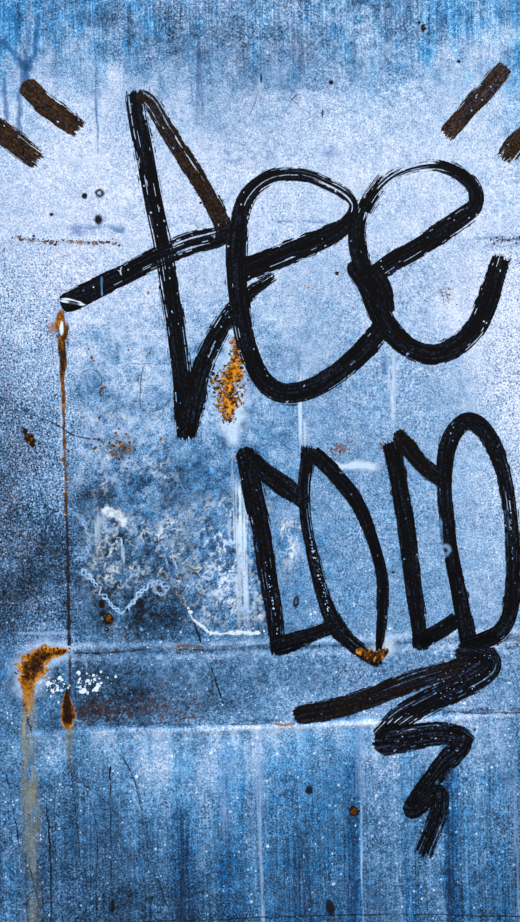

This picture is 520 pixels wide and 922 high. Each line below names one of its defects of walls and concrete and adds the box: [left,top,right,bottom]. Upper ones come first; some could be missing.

water stain [55,506,182,614]
rust [13,310,253,743]
water stain [187,475,265,636]
rust [356,637,399,663]